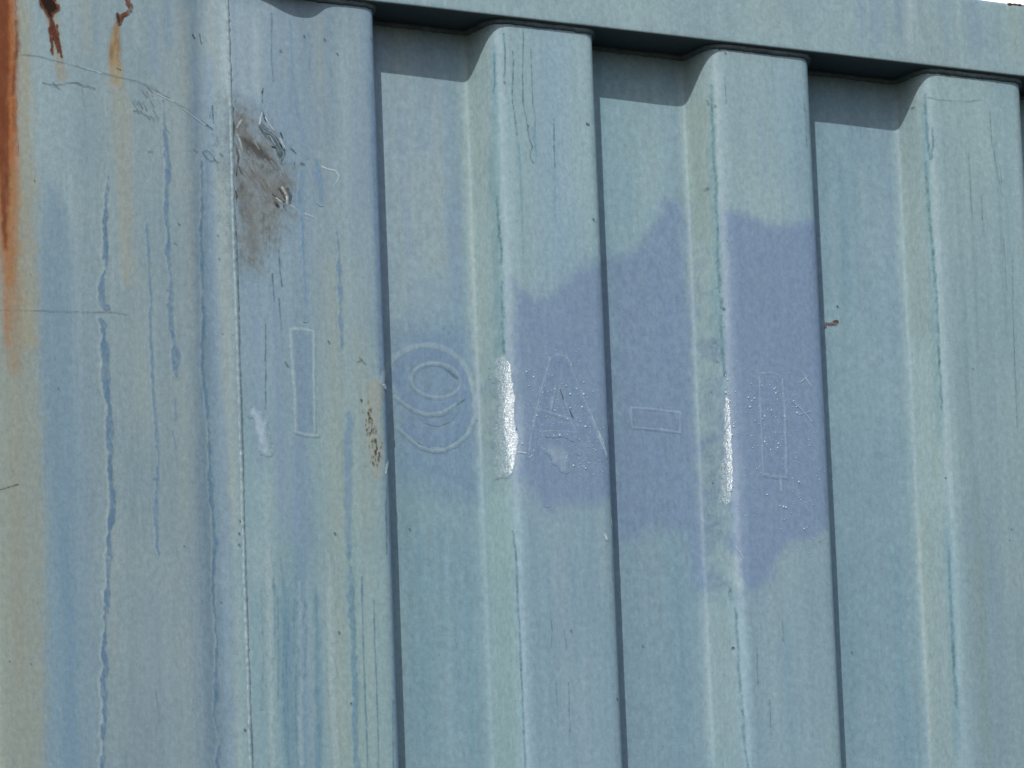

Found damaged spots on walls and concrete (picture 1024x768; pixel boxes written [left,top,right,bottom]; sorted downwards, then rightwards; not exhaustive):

rust [106,0,134,65]
rust [0,0,71,768]
rust [360,374,388,483]